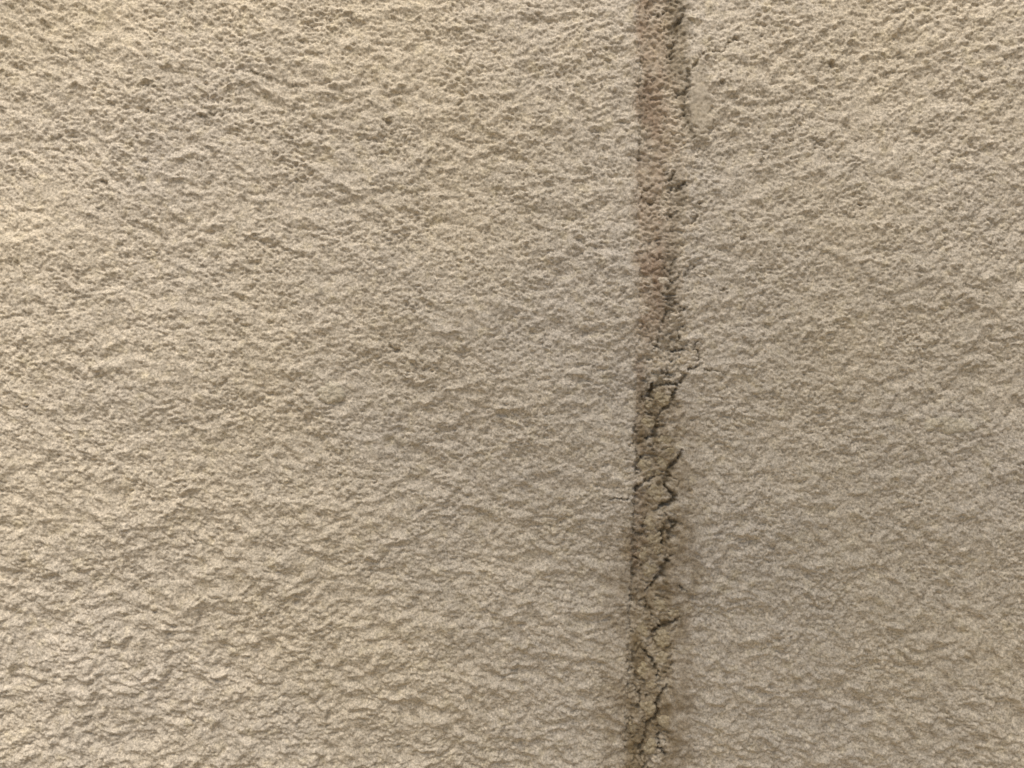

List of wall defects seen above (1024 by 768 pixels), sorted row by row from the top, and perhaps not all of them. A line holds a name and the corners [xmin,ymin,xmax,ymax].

crack [631,455,679,579]